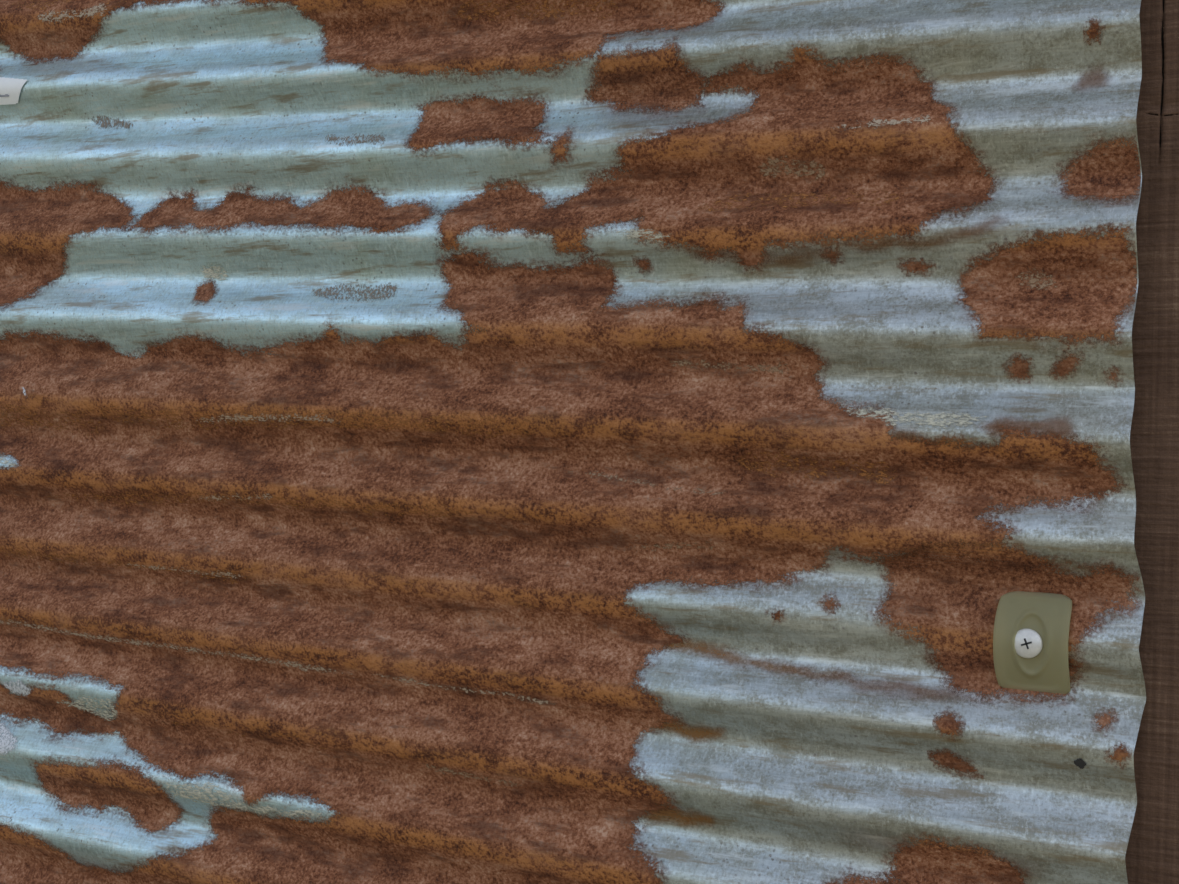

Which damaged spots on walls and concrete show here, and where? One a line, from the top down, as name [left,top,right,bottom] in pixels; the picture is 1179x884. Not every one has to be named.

rust [0,0,227,65]
rust [234,0,725,79]
rust [1083,18,1106,45]
rust [91,116,133,129]
rust [325,133,386,146]
rust [404,94,572,167]
rust [436,37,997,271]
rust [1055,136,1141,205]
rust [0,178,438,309]
rust [957,223,1137,380]
rust [0,247,1140,884]